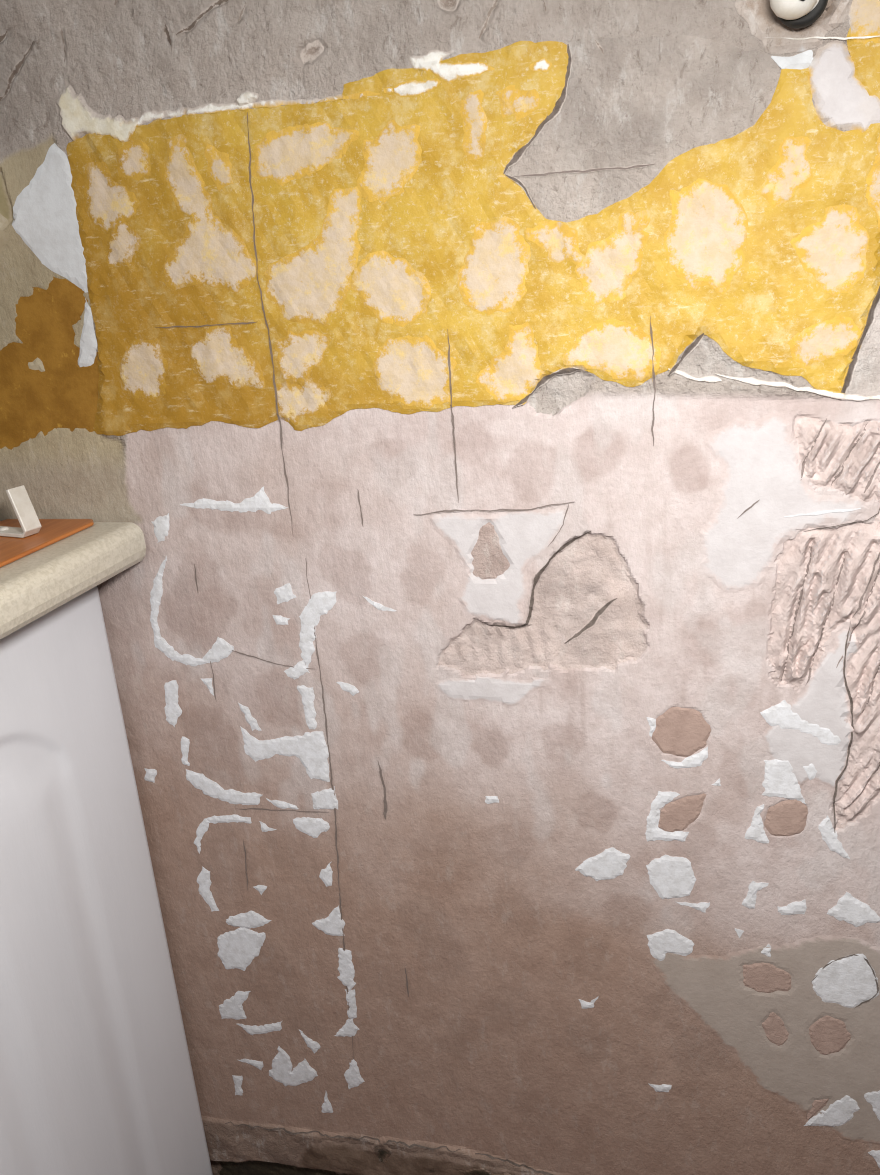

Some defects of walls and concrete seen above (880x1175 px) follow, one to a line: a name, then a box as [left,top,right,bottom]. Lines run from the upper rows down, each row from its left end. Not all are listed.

peeling [847,0,880,99]
peeling [0,35,880,450]
flaking render [471,522,510,579]
flaking render [437,531,649,675]
flaking render [744,415,880,859]
peeling [164,583,338,971]
flaking render [647,707,711,769]
peeling [646,855,710,913]
peeling [312,906,359,1037]
peeling [809,954,880,1055]
peeling [239,1030,321,1086]
water stain [213,1136,537,1175]